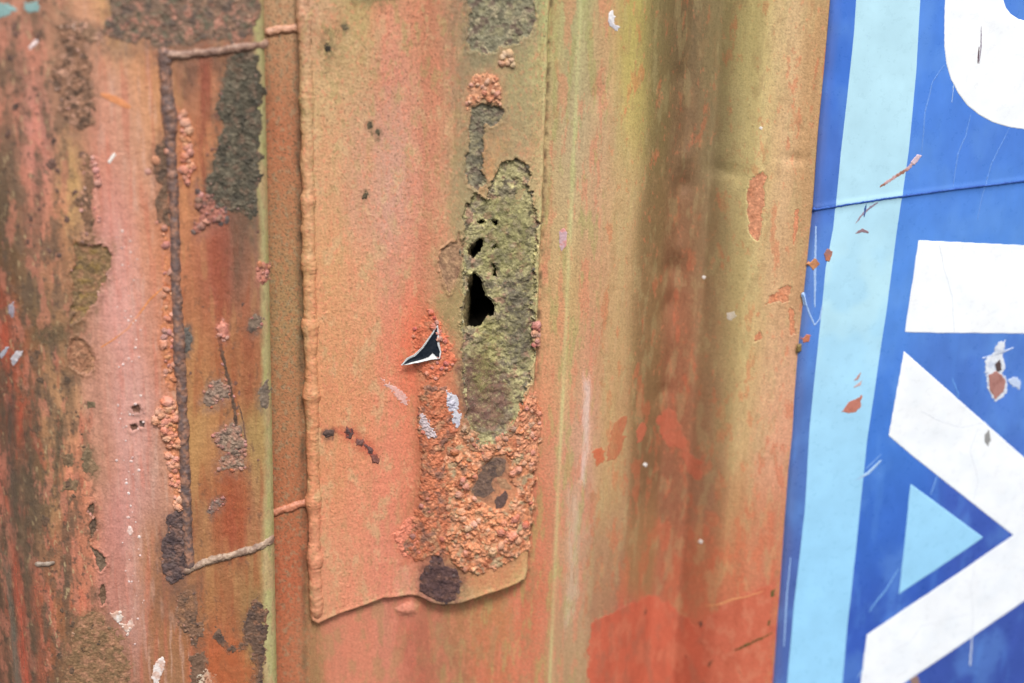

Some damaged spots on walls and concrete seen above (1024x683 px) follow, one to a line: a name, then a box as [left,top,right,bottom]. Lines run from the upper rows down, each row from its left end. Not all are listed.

corrosion [45,158,60,175]
peeling [746,172,767,241]
corrosion [49,0,269,683]
corrosion [392,0,543,606]
corrosion [11,398,37,462]
corrosion [13,557,40,683]